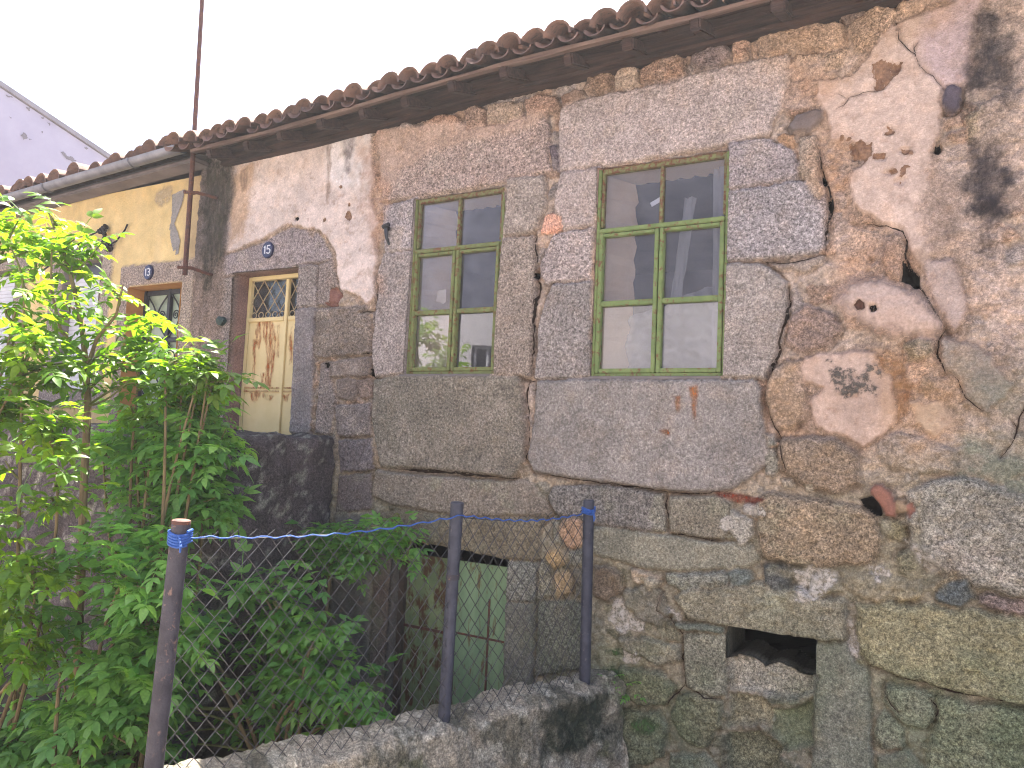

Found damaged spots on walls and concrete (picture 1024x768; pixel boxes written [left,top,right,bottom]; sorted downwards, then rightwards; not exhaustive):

spalling [872,59,903,91]
crack [895,17,941,86]
leakage [969,13,1003,85]
peeling [169,189,185,255]
leakage [199,162,247,291]
crack [760,152,833,264]
spalling [840,135,913,184]
leakage [964,144,1013,218]
crack [867,224,981,410]
rust [251,321,292,400]
rust [676,386,698,418]